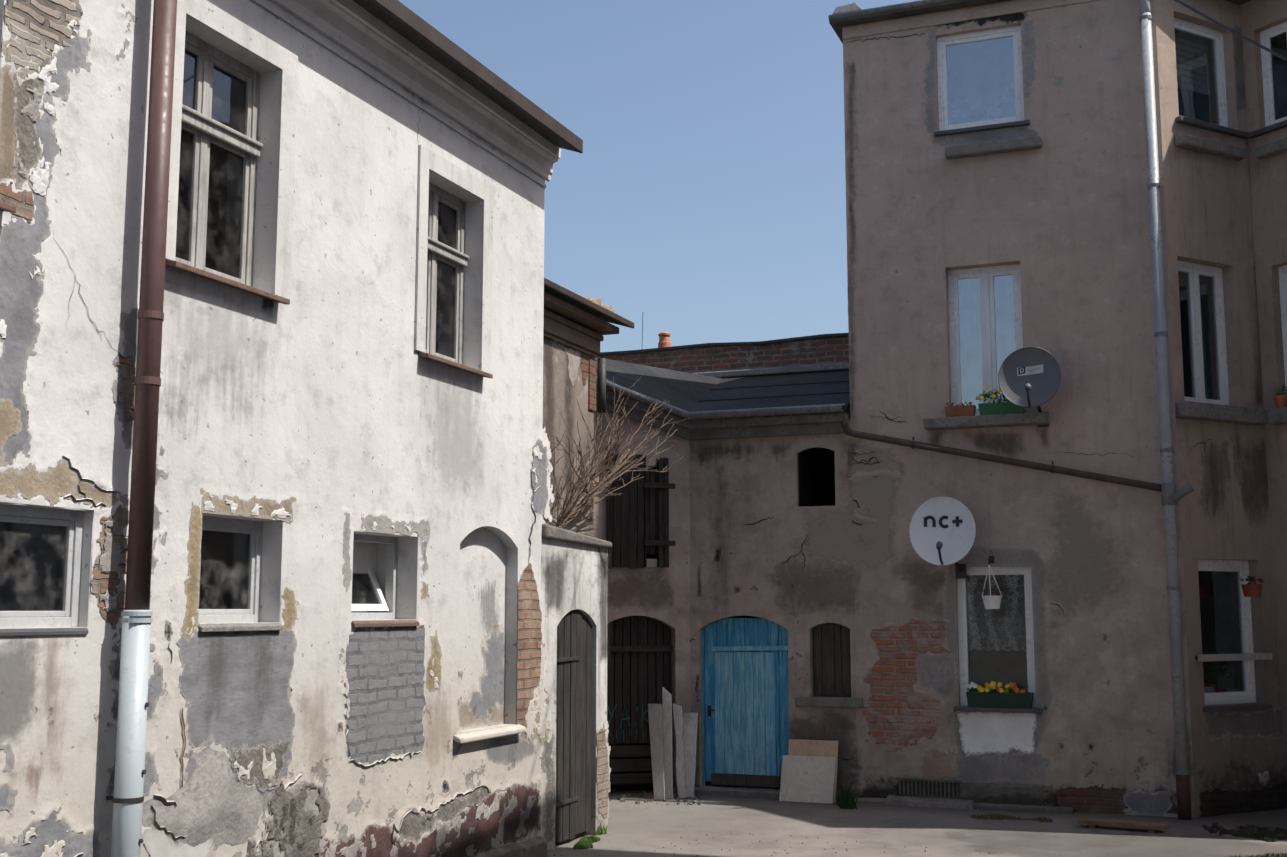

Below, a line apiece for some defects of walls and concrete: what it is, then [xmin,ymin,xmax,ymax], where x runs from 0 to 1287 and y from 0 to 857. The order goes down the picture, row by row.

crack [53,233,135,378]
peeling [0,0,151,857]
flaking render [150,322,300,643]
flaking render [338,502,436,604]
spalling [524,424,554,532]
crack [779,450,902,576]
peeling [141,550,556,857]
flaking render [853,608,958,763]